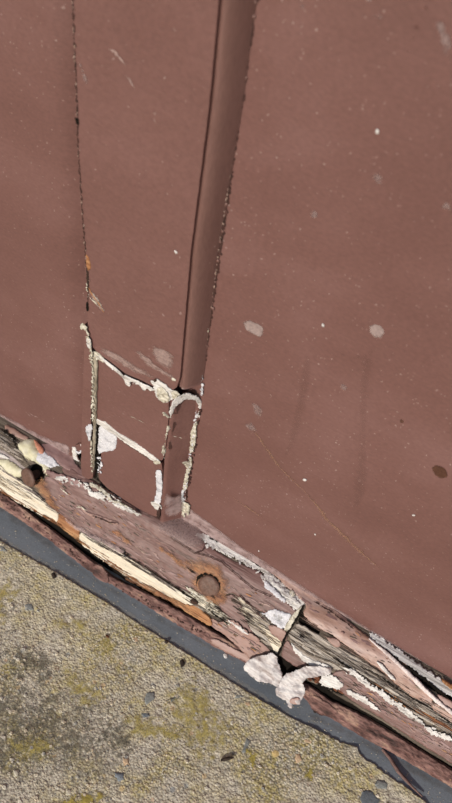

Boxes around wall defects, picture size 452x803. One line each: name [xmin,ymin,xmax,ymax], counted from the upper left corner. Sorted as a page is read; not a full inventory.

peeling [5,323,215,607]
crack [76,419,161,465]
rust [159,547,226,604]
crack [86,534,304,656]
peeling [200,533,452,722]
peeling [212,619,452,757]